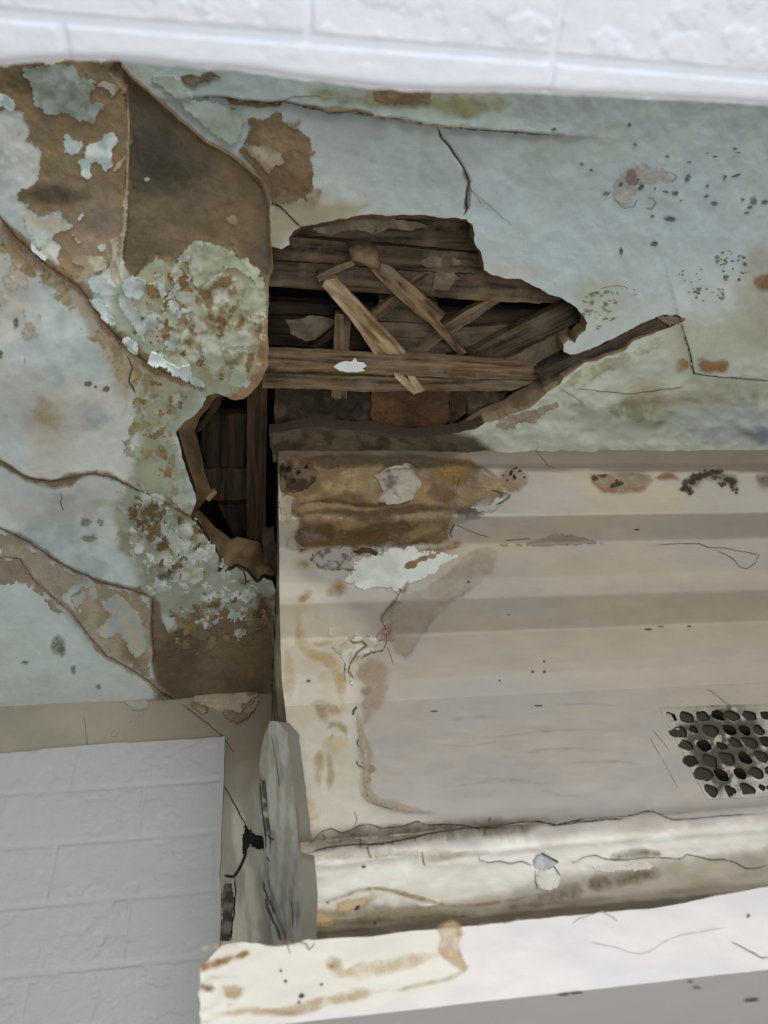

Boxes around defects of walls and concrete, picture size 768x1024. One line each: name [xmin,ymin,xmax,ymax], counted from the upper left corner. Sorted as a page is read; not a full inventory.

crack [217,95,542,226]
flaking render [290,214,466,238]
peeling [0,59,322,579]
crack [0,460,186,516]
damp [282,453,525,552]
peeling [286,536,458,592]
flaking render [0,534,275,725]
crack [224,680,357,953]
crack [312,707,750,865]
damp [201,951,248,970]
damp [236,992,366,1015]
damp [317,887,467,969]